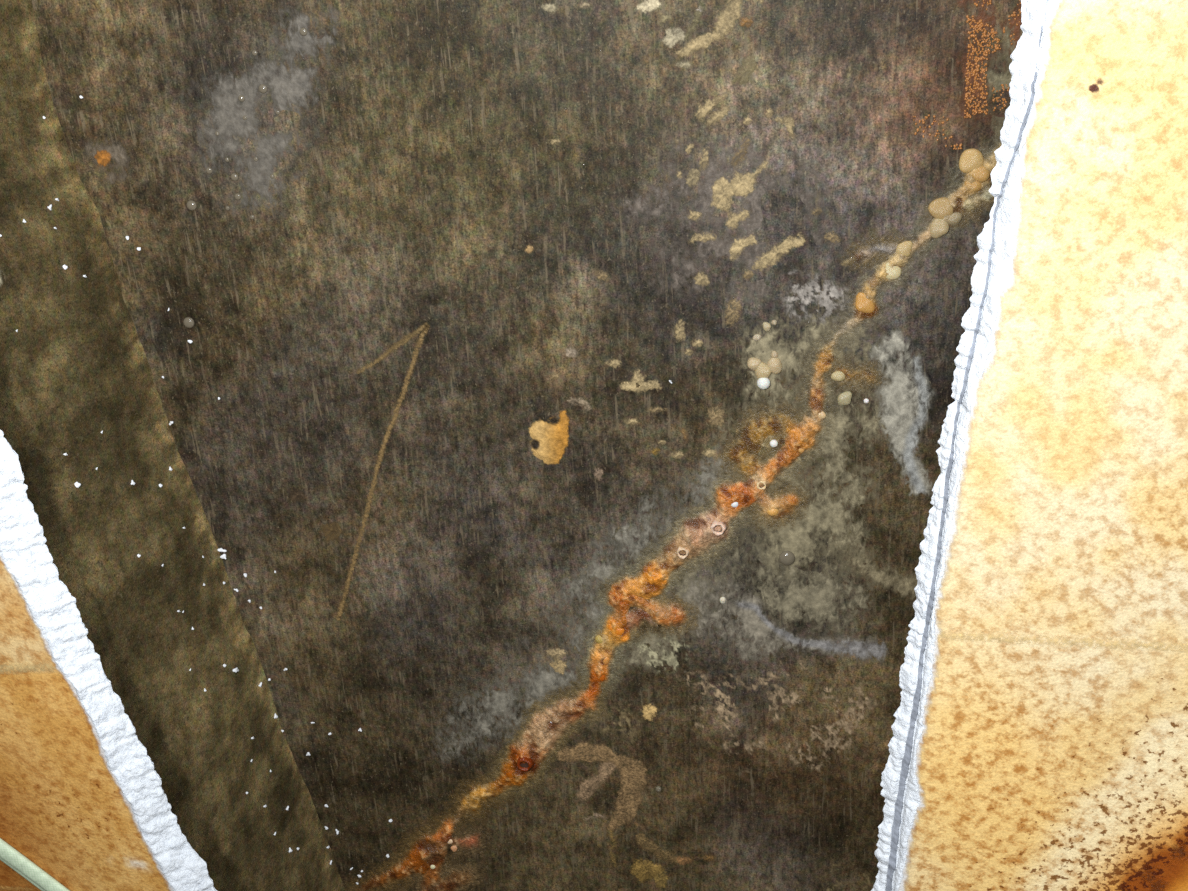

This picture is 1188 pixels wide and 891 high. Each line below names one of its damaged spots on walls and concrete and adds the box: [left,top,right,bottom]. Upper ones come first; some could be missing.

leakage [197,9,337,209]
corrosion [913,114,962,150]
corrosion [956,0,1022,118]
leakage [623,136,840,302]
spalling [529,397,591,464]
peeling [620,370,662,393]
peeling [675,320,703,355]
peeling [708,406,724,426]
leakage [904,0,1188,891]
crack [345,134,1002,891]
leakage [622,272,931,754]
leakage [785,686,876,770]